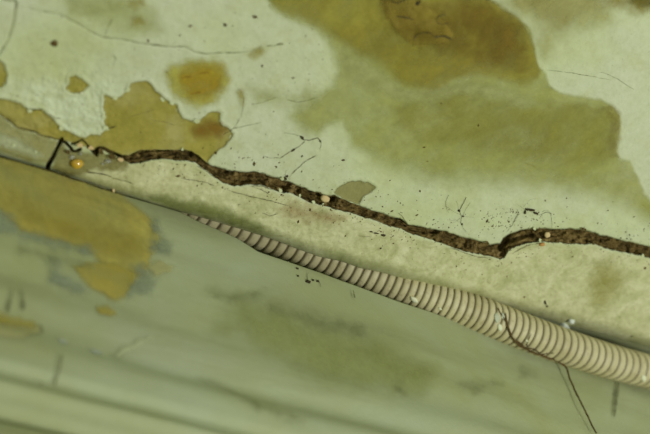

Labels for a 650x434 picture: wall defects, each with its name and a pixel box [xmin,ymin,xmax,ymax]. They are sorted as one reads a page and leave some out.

peeling [66,76,89,95]
peeling [0,81,233,176]
water stain [271,0,650,213]
crack [0,133,650,258]
peeling [335,181,376,204]